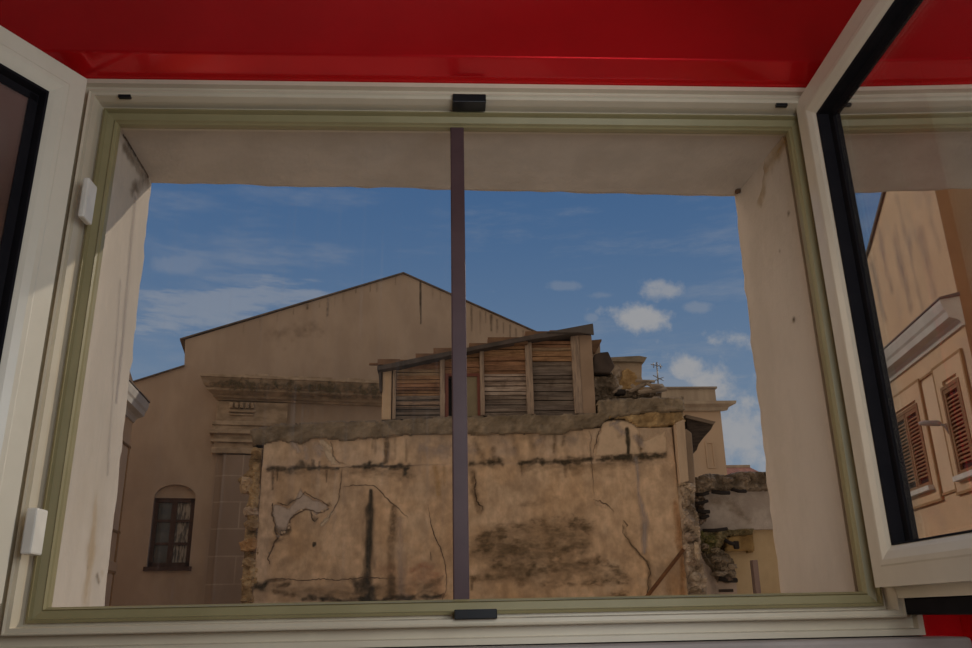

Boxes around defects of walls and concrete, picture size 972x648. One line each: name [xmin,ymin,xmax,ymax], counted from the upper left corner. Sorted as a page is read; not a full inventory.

peeling [267,490,329,564]
leakage [254,489,441,602]
crack [321,472,406,526]
crack [428,508,447,599]
leakage [518,427,665,482]
crack [590,436,651,593]